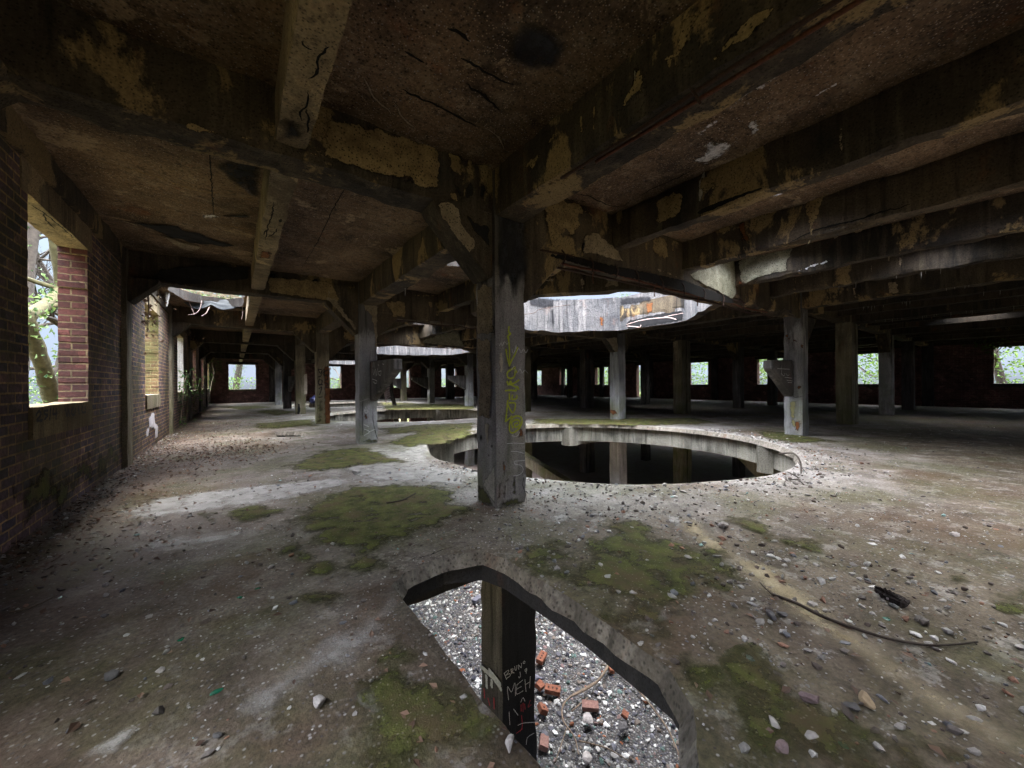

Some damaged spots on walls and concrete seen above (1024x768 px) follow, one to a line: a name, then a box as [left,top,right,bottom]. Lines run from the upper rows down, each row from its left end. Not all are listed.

crack [299,41,329,132]
crack [402,89,478,127]
crack [448,28,514,111]
leakage [510,28,562,68]
peeling [713,8,773,60]
peeling [310,120,489,188]
peeling [438,189,475,253]
spalling [545,200,734,303]
peeling [656,192,683,223]
spalling [697,174,767,214]